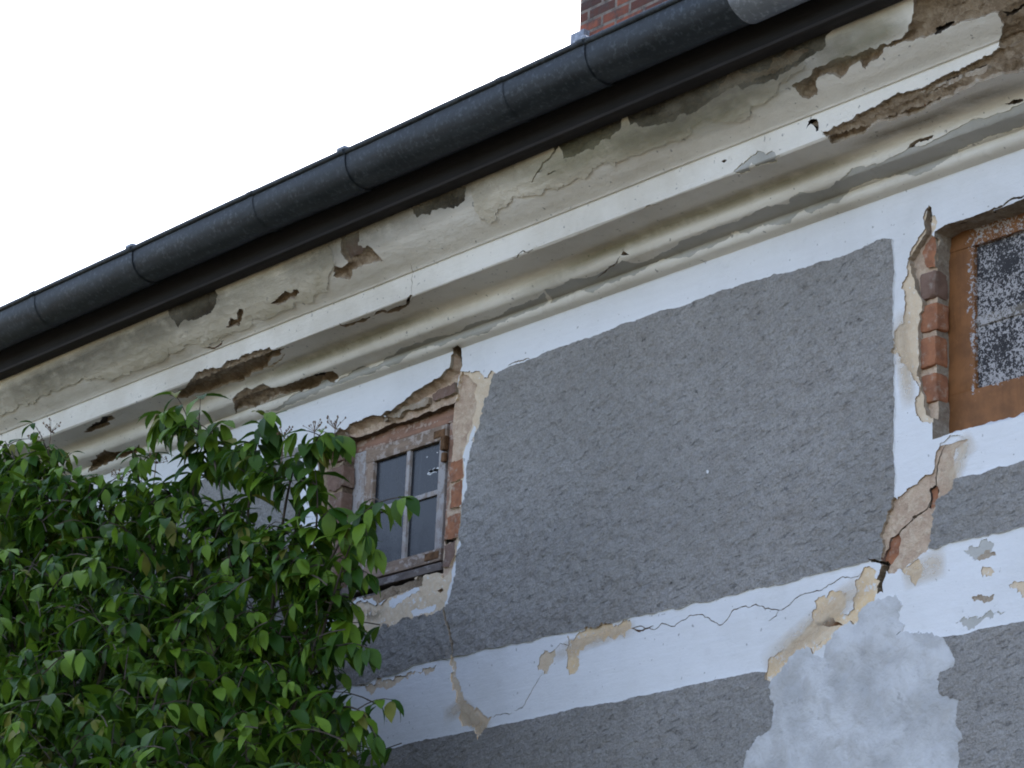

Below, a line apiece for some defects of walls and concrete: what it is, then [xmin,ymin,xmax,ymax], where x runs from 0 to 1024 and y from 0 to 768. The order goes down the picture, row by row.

peeling [470,0,1024,224]
spalling [84,415,115,432]
spalling [88,445,139,472]
peeling [0,235,383,416]
peeling [169,99,1024,632]
crack [632,445,946,632]
peeling [764,435,968,682]
peeling [449,620,632,740]